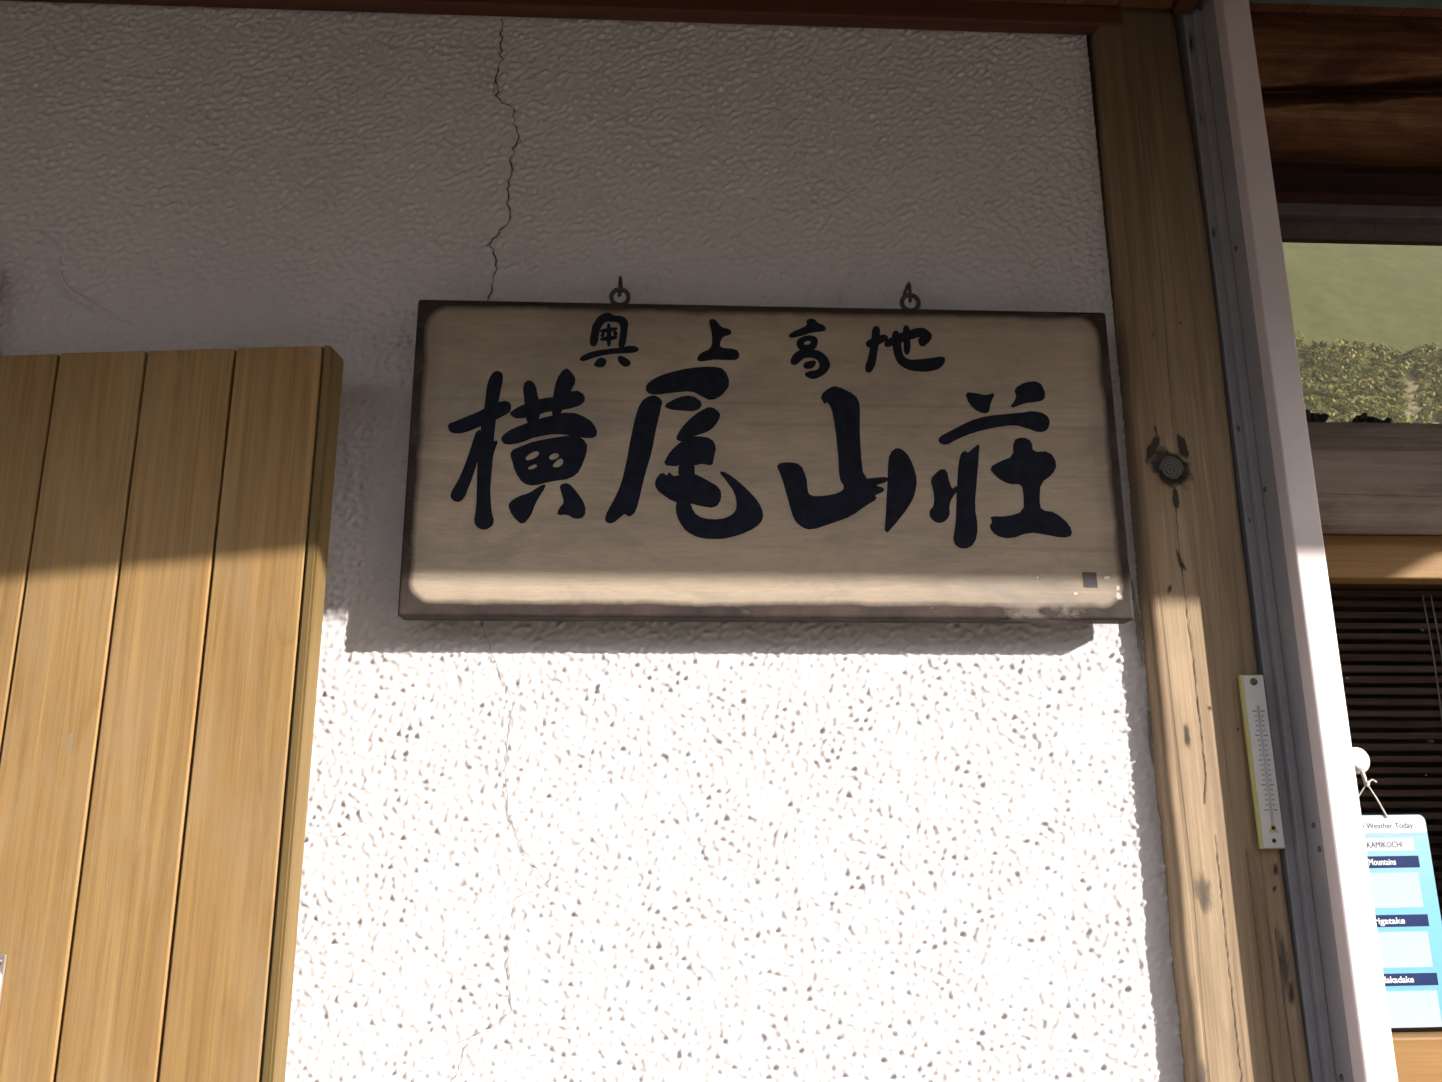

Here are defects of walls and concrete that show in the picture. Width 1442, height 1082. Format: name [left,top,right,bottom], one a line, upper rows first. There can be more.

crack [486,19,522,301]
crack [452,621,553,1081]